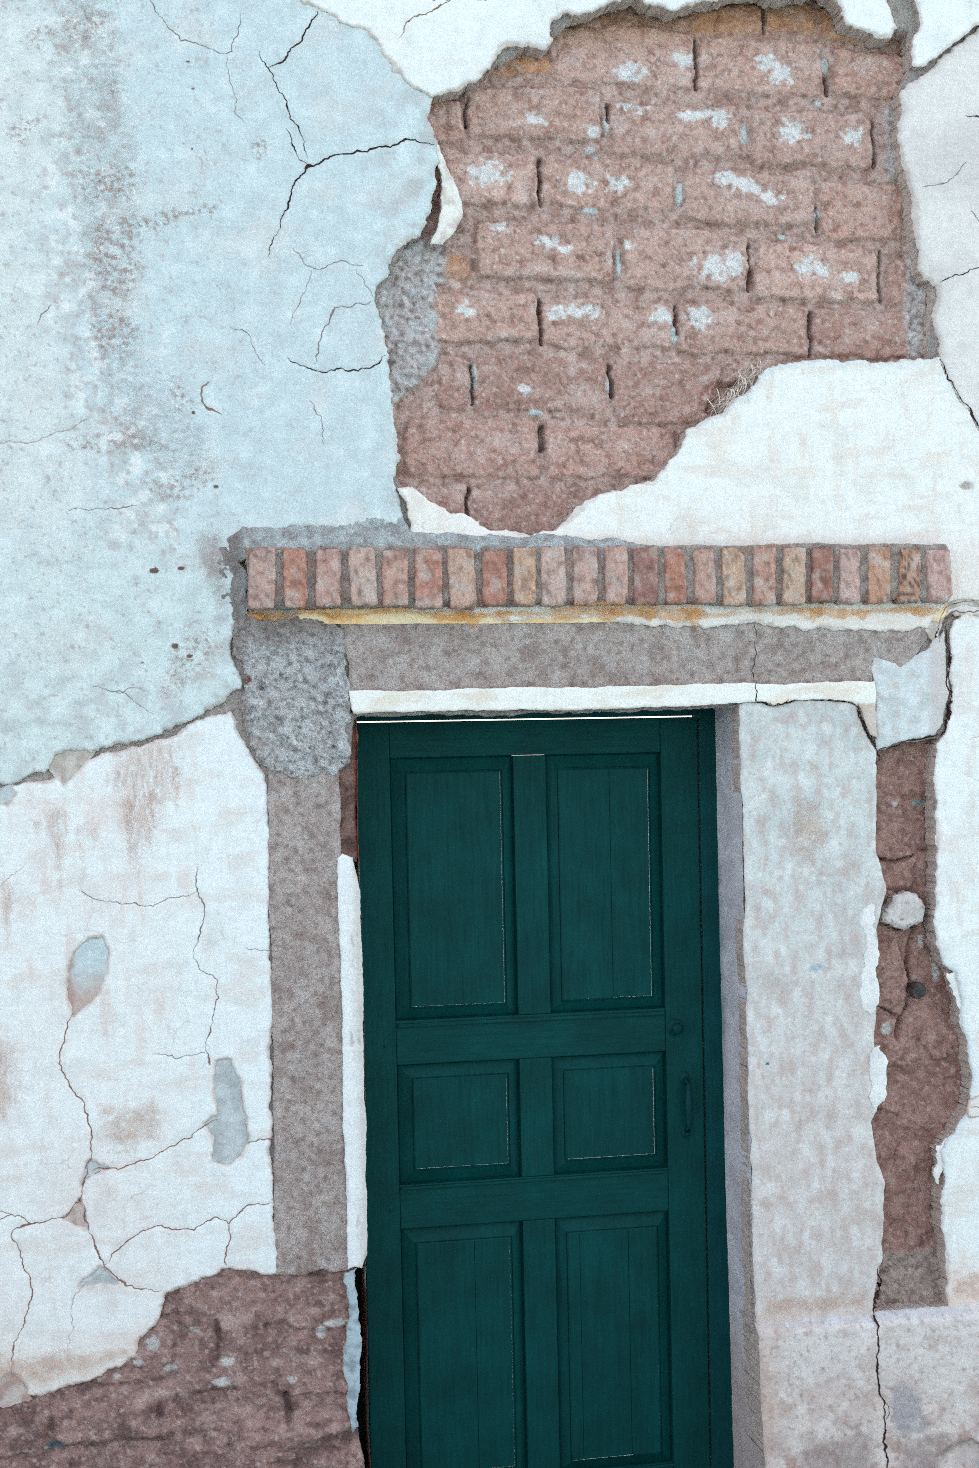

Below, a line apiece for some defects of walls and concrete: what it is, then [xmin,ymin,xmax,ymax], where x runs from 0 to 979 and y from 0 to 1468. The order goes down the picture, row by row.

crack [150,0,434,444]
spalling [377,0,929,535]
peeling [67,938,109,1017]
crack [0,1014,269,1374]
spalling [0,1267,365,1468]
peeling [205,1059,248,1164]
crack [873,1267,890,1467]
spalling [860,739,962,1305]